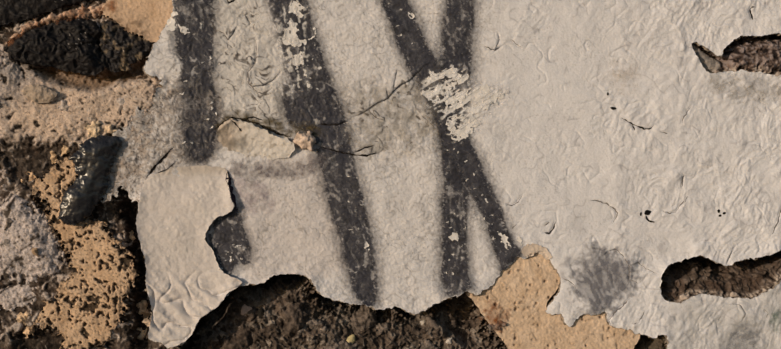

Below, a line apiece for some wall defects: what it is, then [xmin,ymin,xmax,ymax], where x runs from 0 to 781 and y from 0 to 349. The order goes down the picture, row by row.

peeling [282,1,322,89]
spalling [692,34,781,77]
spalling [0,0,178,349]
peeling [205,101,295,160]
crack [317,145,376,157]
crack [323,70,420,126]
peeling [422,65,509,153]
spalling [136,165,667,349]
spalling [661,251,781,303]